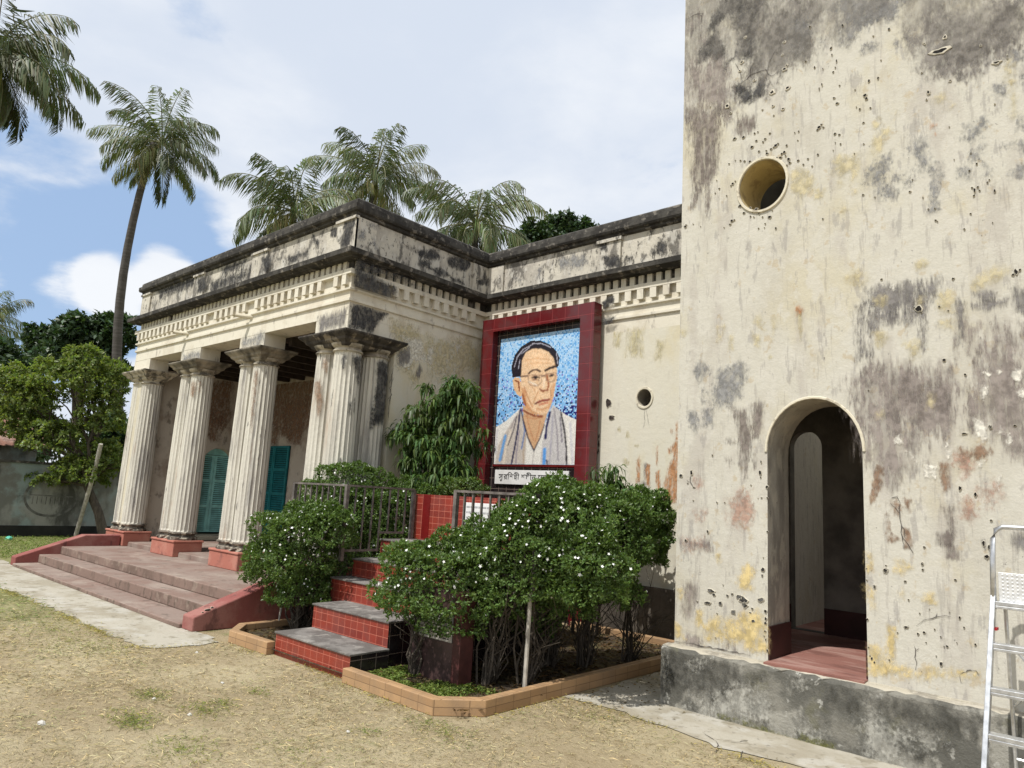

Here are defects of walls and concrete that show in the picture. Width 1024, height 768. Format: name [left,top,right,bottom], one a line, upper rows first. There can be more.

water stain [684,0,814,216]
spalling [728,130,819,167]
peeling [854,76,888,154]
water stain [288,220,375,264]
water stain [319,305,388,333]
water stain [370,348,421,428]
water stain [850,280,957,488]
water stain [955,287,1024,457]
peeling [982,370,1024,398]
rust [637,425,678,503]
peeling [962,420,993,440]
crack [891,497,913,552]